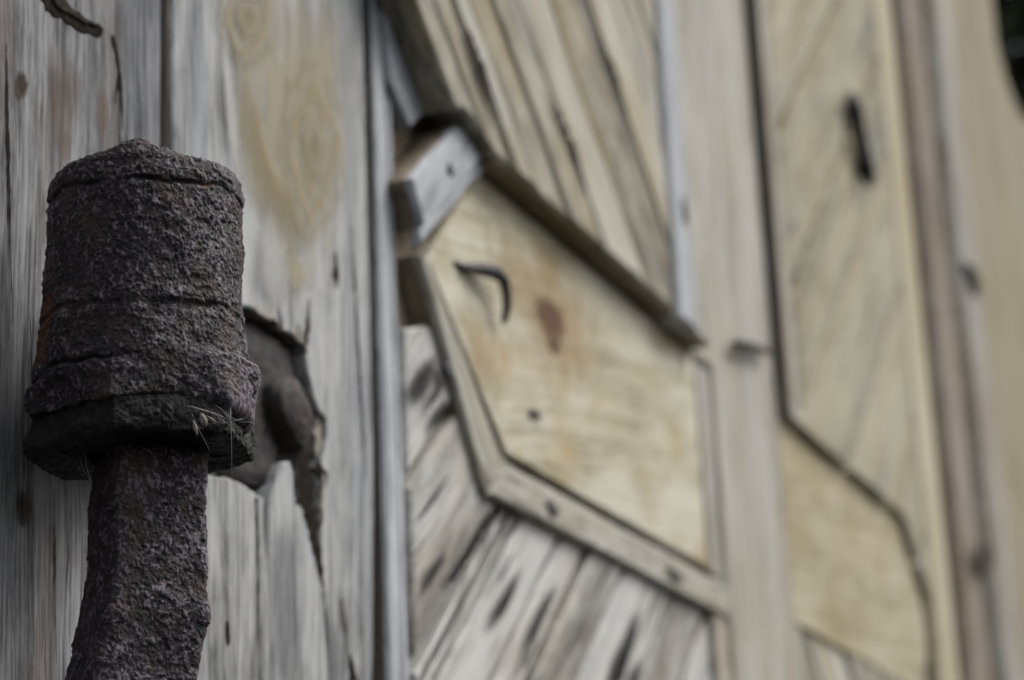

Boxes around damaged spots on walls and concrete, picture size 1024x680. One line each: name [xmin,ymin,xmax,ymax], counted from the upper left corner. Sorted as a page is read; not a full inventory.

peeling [244,301,308,354]
peeling [291,415,325,526]